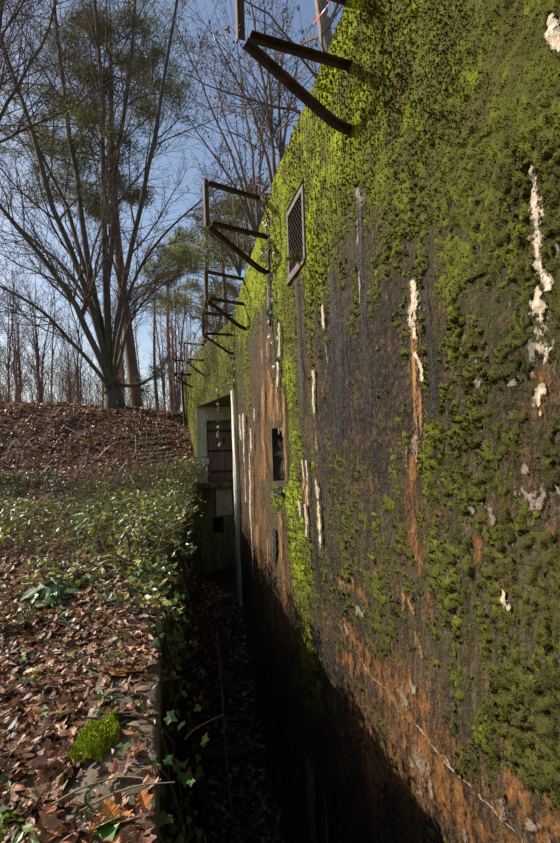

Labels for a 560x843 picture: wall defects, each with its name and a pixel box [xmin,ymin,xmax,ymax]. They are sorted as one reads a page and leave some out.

peeling [544,13,560,52]
peeling [527,165,554,362]
peeling [407,280,423,462]
rust [404,437,423,570]
peeling [509,464,546,511]
crack [362,660,515,831]
rust [334,579,560,843]